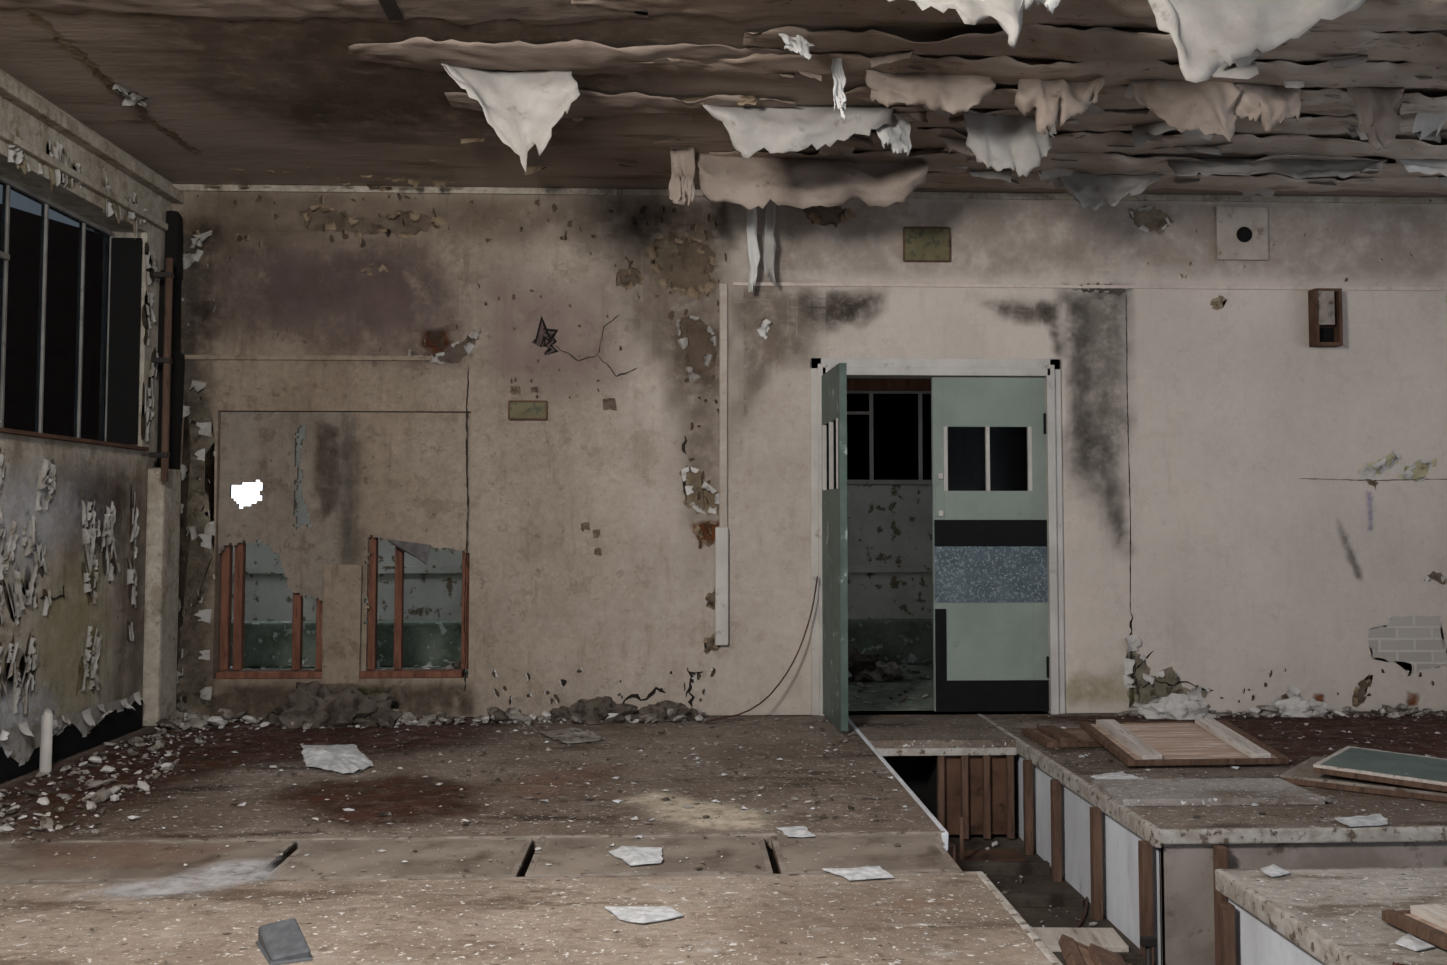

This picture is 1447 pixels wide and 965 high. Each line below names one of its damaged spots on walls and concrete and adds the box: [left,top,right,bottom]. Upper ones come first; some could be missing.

peeling [441,63,584,176]
peeling [535,199,597,256]
damp [1000,304,1055,321]
damp [1072,291,1123,498]
peeling [0,447,143,766]
flaking render [176,379,218,713]
damp [0,200,481,829]
peeling [679,458,719,549]
flaking render [1114,614,1447,776]
peeling [15,718,921,886]